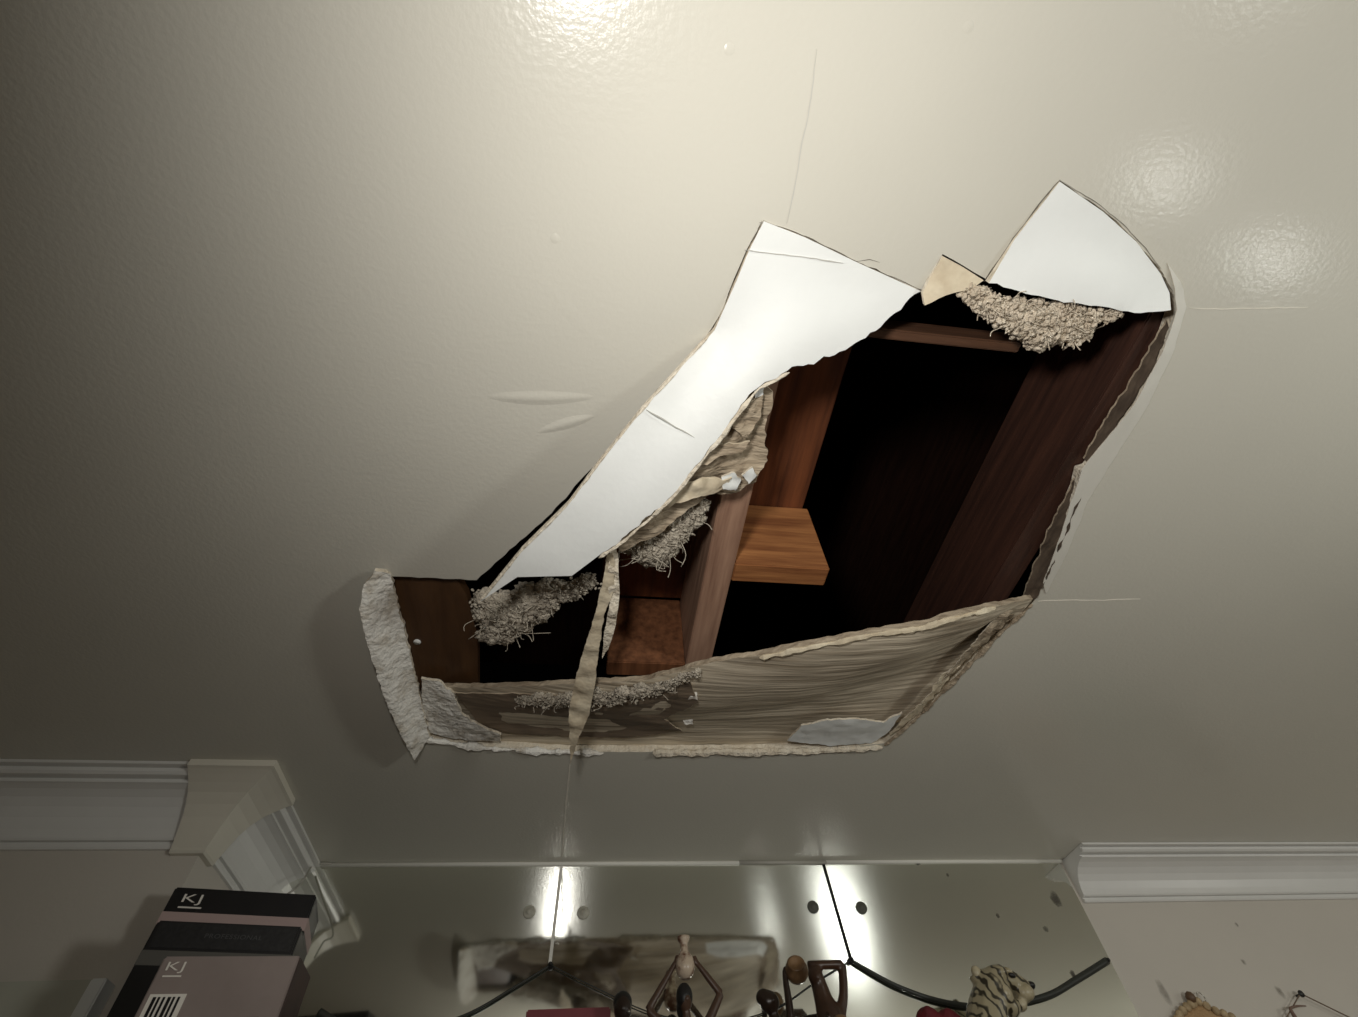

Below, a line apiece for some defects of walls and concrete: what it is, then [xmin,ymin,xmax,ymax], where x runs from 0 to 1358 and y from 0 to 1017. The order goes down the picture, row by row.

crack [747,51,922,290]
peeling [1043,263,1186,593]
peeling [421,677,501,741]
peeling [787,711,902,746]